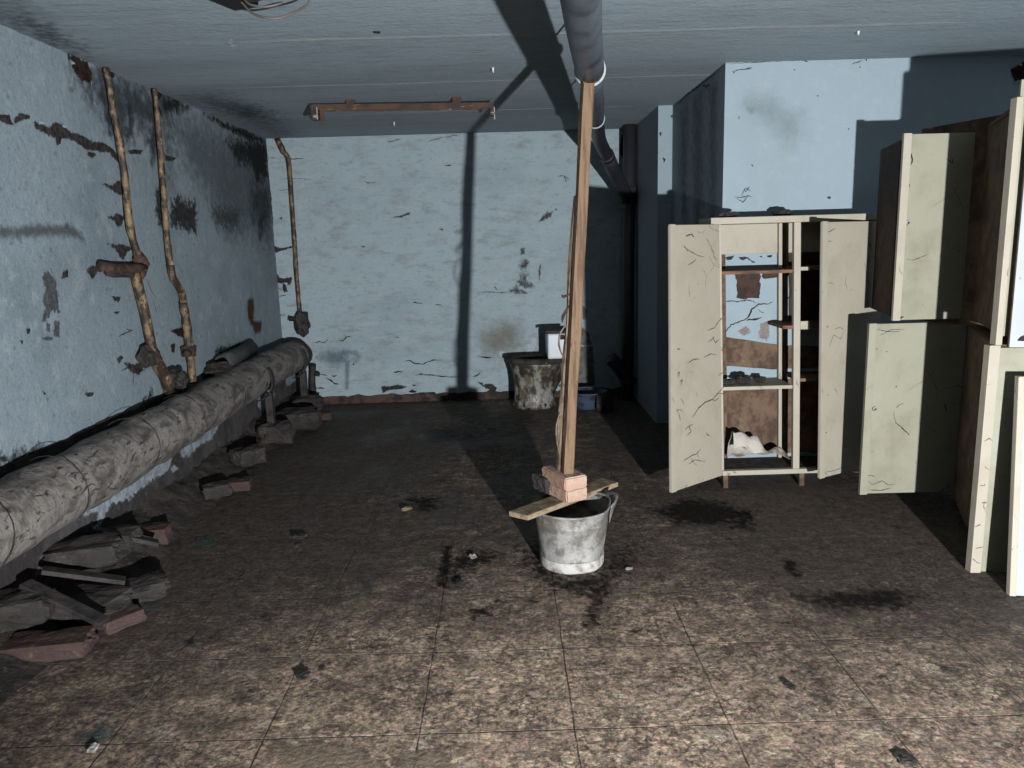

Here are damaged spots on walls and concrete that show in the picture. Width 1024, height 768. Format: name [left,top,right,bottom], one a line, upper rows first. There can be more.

flaking render [68,54,92,85]
flaking render [0,113,143,162]
leakage [203,113,270,238]
peeling [20,269,68,344]
leakage [524,336,540,355]
leakage [655,498,757,531]
leakage [437,546,502,588]
leakage [515,545,633,627]
leakage [796,589,921,611]